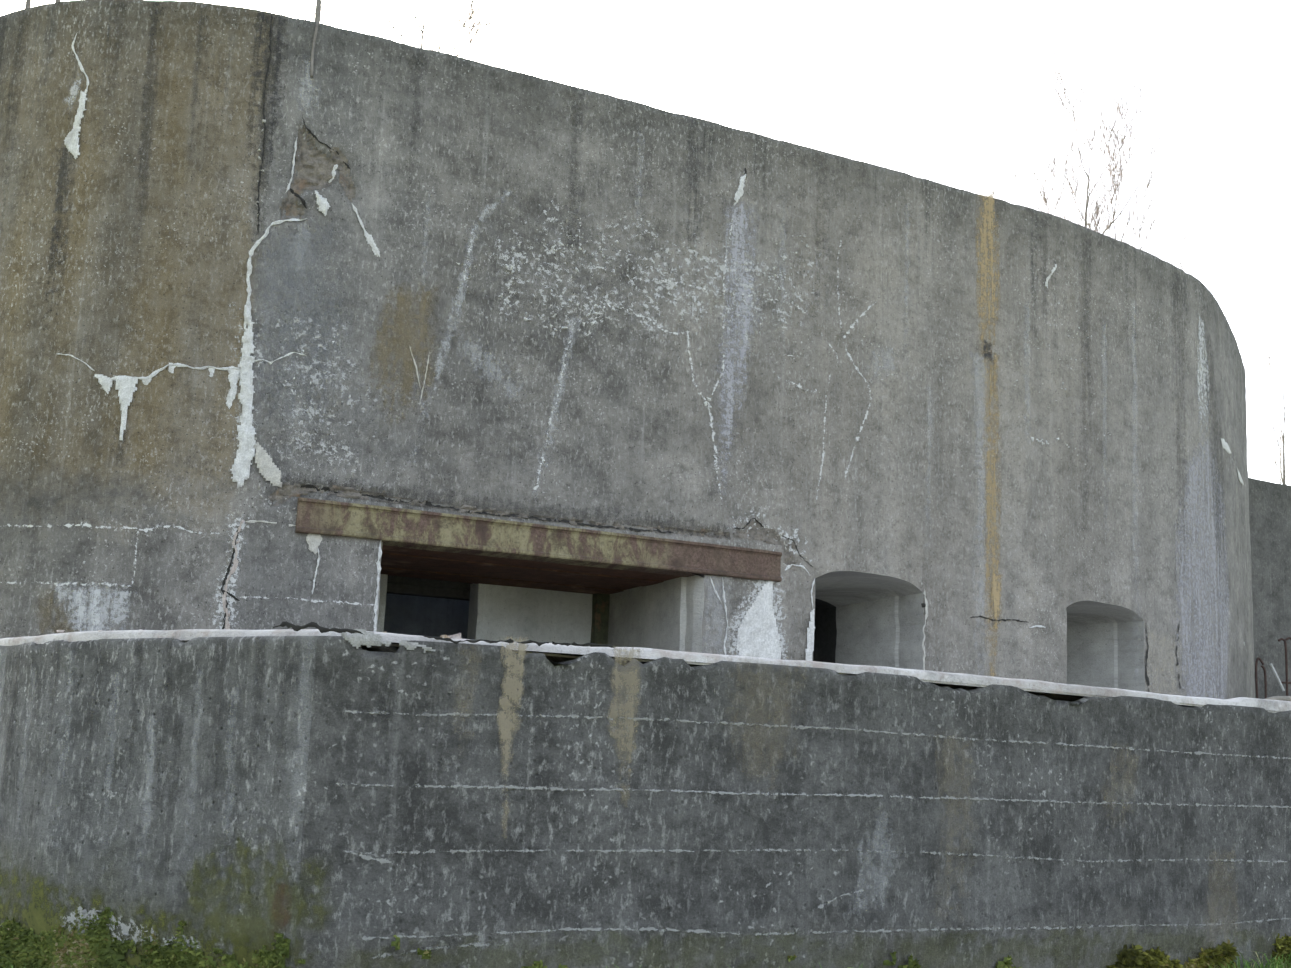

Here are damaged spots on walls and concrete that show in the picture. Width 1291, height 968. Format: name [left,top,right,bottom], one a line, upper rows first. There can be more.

leakage [46,33,89,327]
crack [57,14,369,488]
spalling [279,117,380,257]
efflorescence [479,201,825,349]
crack [687,168,759,499]
crack [816,240,897,500]
corrosion [977,190,1002,677]
efflorescence [55,584,131,632]
crack [6,520,322,629]
flaking render [259,482,815,661]
leakage [497,636,528,774]
leakage [608,646,640,771]